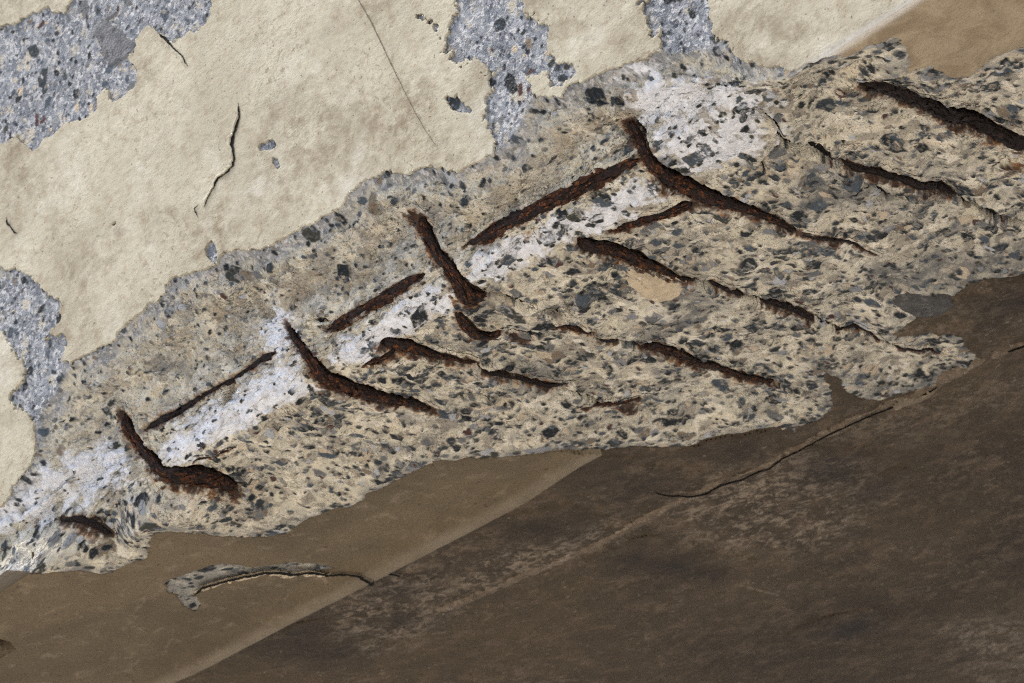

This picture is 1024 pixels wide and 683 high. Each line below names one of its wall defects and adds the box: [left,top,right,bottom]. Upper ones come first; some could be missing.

peeling [0,0,212,152]
crack [194,103,240,217]
damp [458,168,662,292]
peeling [638,0,733,65]
rust [834,155,962,204]
rust [845,79,1024,183]
damp [147,271,453,463]
rust [109,113,883,512]
spalling [0,37,1024,575]
damp [0,415,160,569]
crack [656,407,893,498]
crack [194,570,400,596]